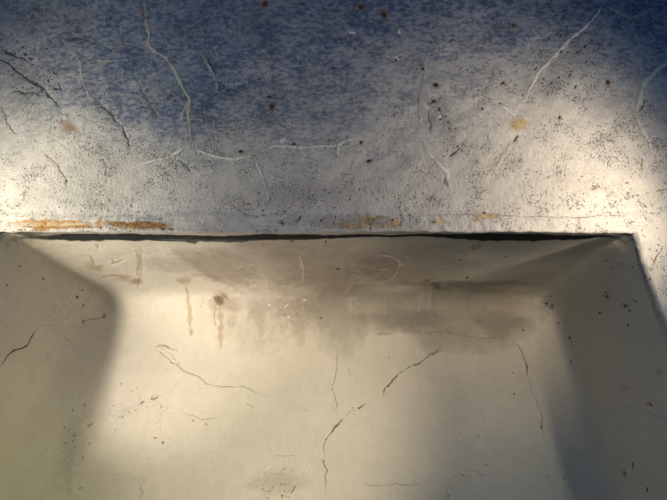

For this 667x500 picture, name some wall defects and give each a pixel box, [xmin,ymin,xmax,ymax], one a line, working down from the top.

crack [1,50,59,107]
crack [62,37,129,146]
crack [127,64,165,125]
crack [133,3,359,204]
crack [500,7,653,117]
crack [496,135,518,167]
rust [11,218,173,233]
crack [2,324,72,364]
crack [383,350,439,394]
crack [322,420,342,490]